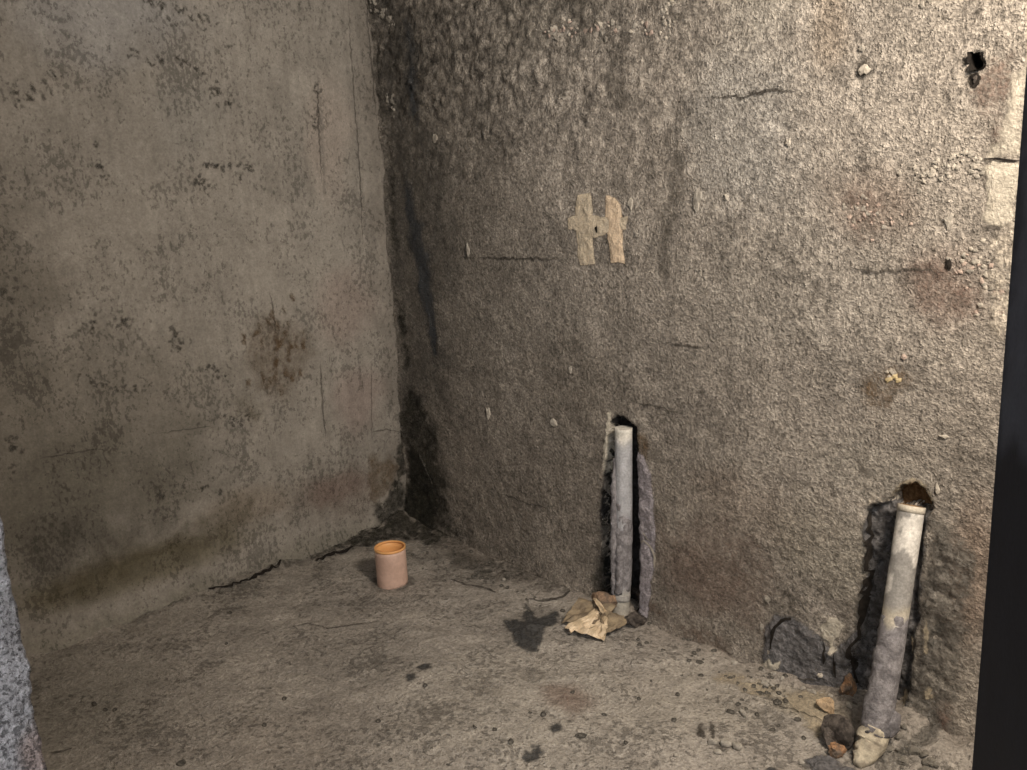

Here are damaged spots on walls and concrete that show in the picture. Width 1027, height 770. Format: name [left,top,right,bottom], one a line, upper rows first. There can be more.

spalling [967,52,1006,88]
crack [712,88,798,100]
damp [392,187,437,355]
crack [473,254,557,262]
crack [851,267,938,275]
spalling [603,411,615,473]
damp [335,391,457,546]
crack [208,527,378,589]
peeling [761,659,780,670]